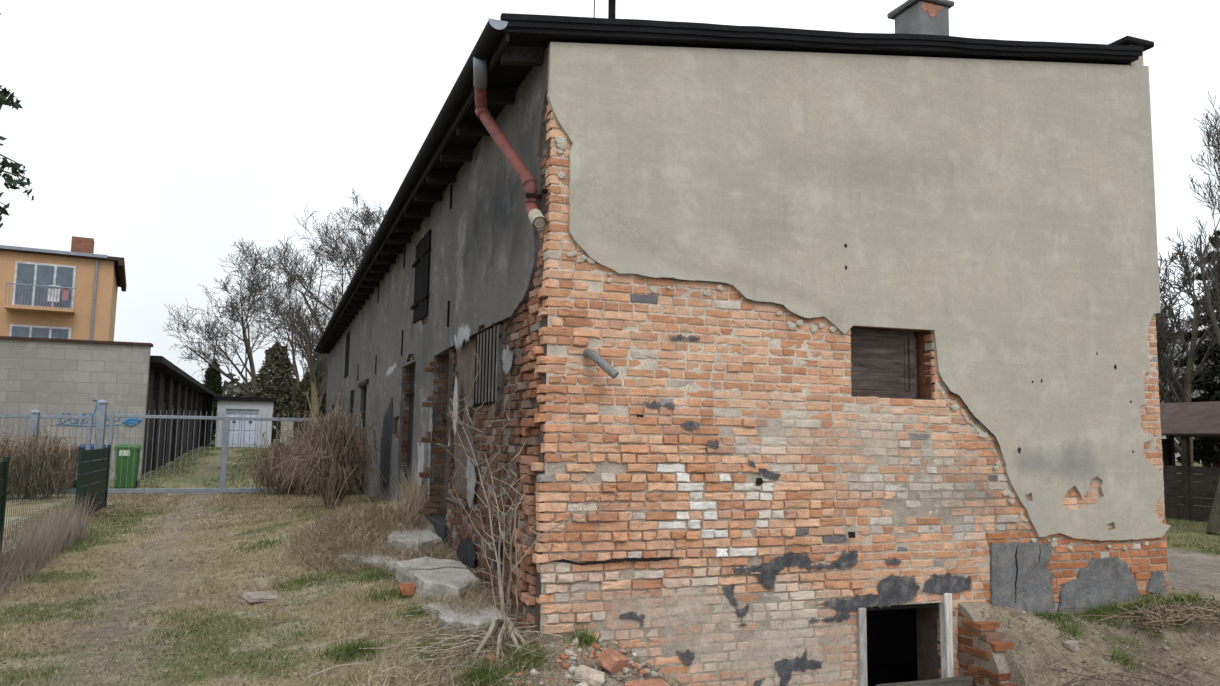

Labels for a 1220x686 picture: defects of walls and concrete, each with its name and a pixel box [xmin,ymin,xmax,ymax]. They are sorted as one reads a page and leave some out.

peeling [397,103,1073,686]
peeling [1062,477,1101,509]
peeling [1130,313,1166,524]